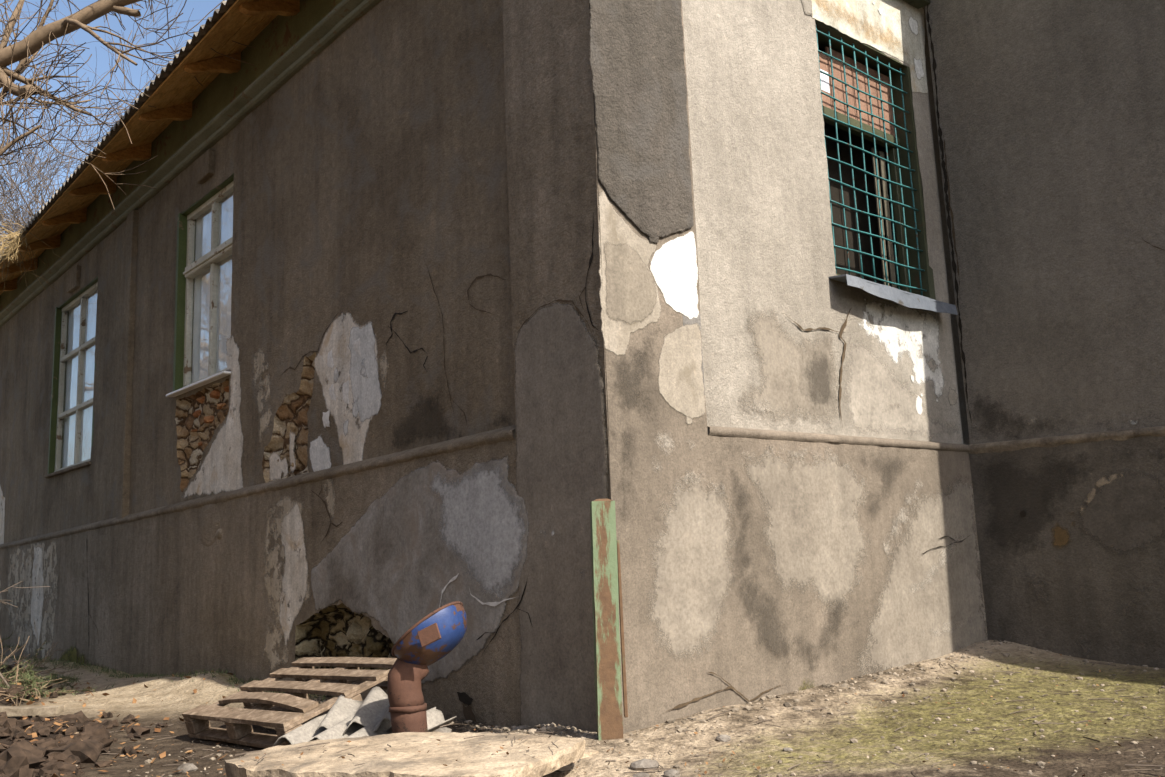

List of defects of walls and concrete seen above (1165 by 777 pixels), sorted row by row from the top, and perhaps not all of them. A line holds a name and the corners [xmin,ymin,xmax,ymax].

flaking render [801,0,928,93]
flaking render [175,335,243,497]
flaking render [254,312,387,516]
crack [386,260,467,423]
crack [467,274,506,314]
crack [517,212,598,333]
flaking render [650,231,699,319]
crack [785,309,851,429]
peeling [863,298,958,415]
flaking render [264,497,397,670]
leakage [742,555,789,655]